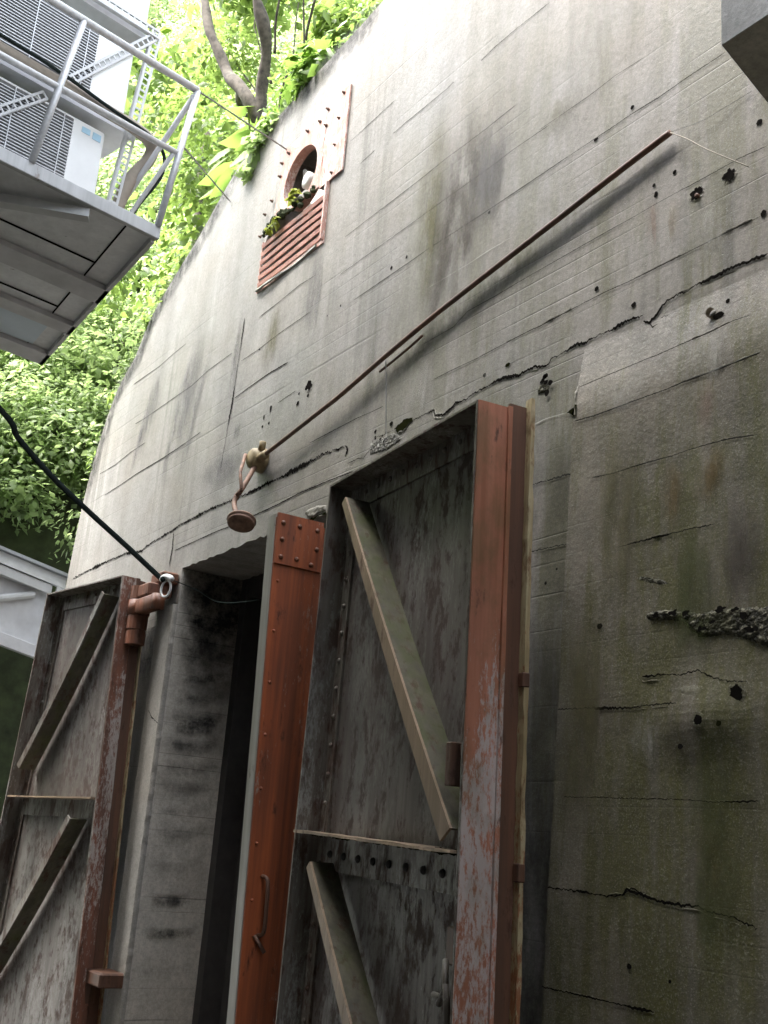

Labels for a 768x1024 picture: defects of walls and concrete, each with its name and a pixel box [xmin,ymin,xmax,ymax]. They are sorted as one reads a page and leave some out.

spalling [538,373,553,397]
spalling [370,418,413,455]
crack [73,253,768,579]
spalling [646,606,768,647]
crack [558,669,747,711]
crack [548,886,757,930]
crack [542,986,655,1014]